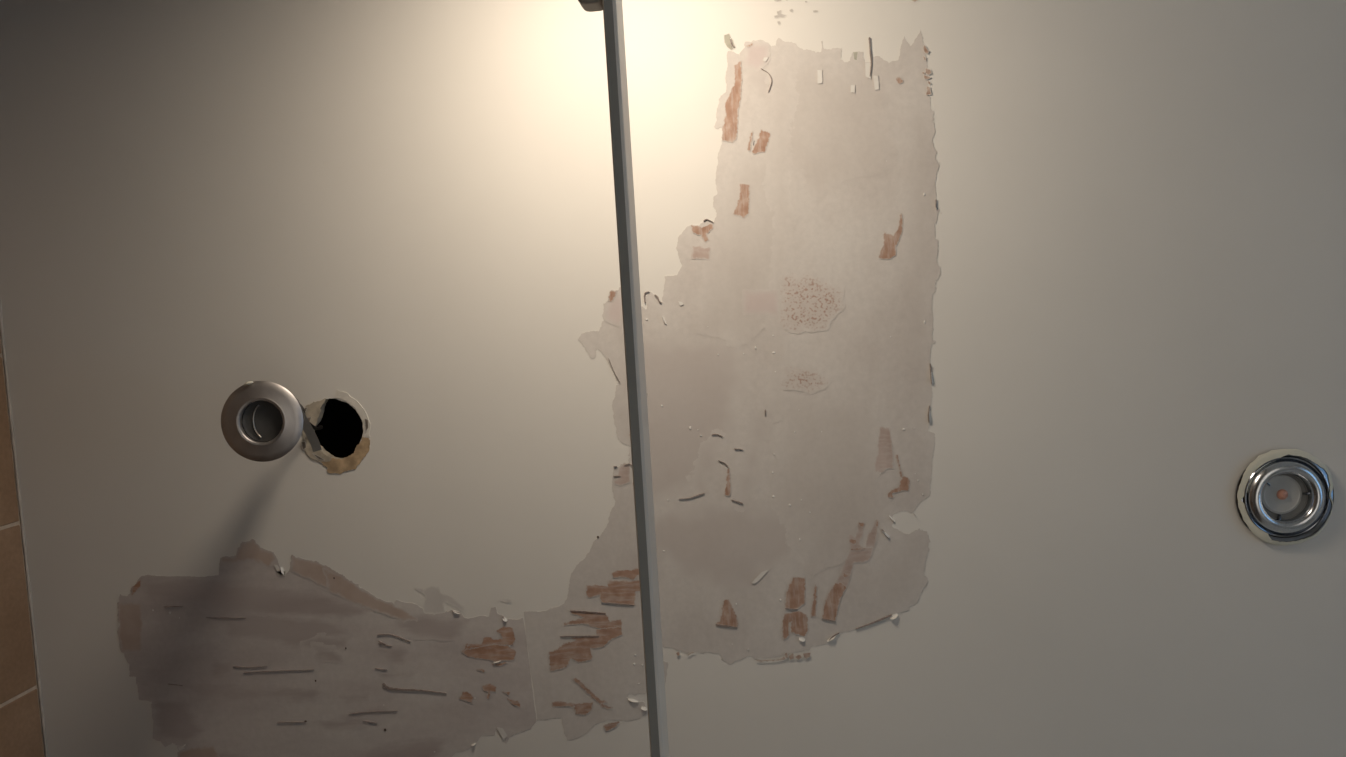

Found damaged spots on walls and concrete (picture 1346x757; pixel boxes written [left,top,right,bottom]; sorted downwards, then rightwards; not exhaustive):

peeling [117,287,647,757]
peeling [641,0,941,682]